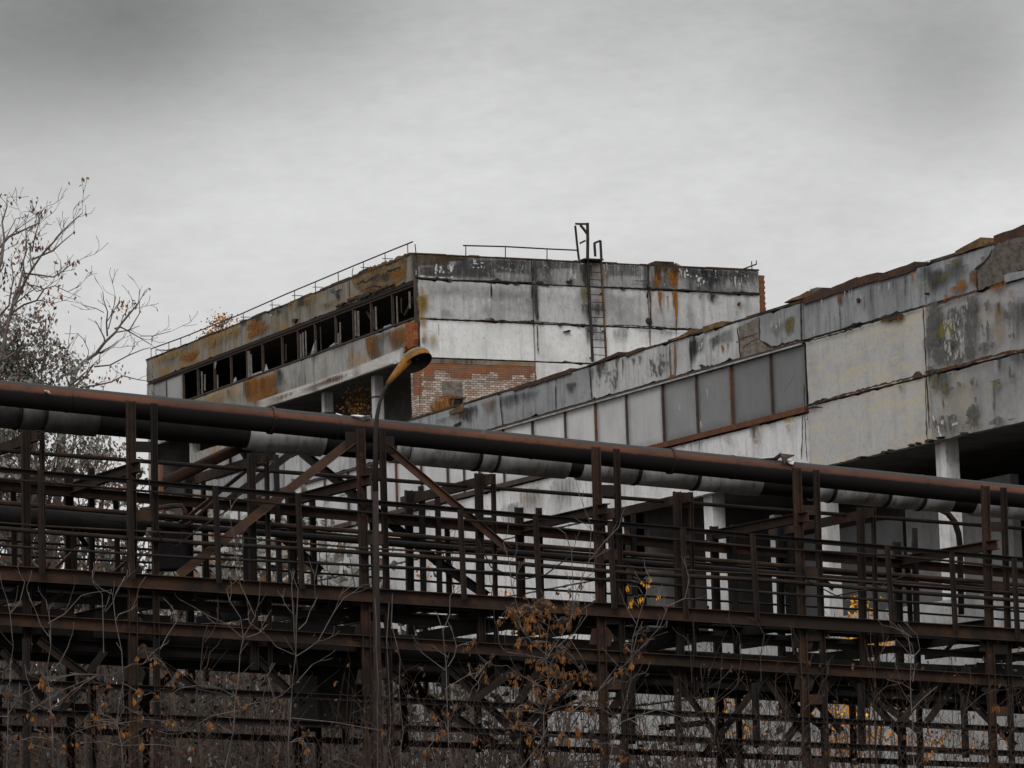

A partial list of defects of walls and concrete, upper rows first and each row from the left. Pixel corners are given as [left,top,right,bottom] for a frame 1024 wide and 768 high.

leakage [418,255,603,315]
rust [654,262,680,335]
rust [366,327,405,358]
spalling [739,317,801,358]
peeling [908,236,1024,447]